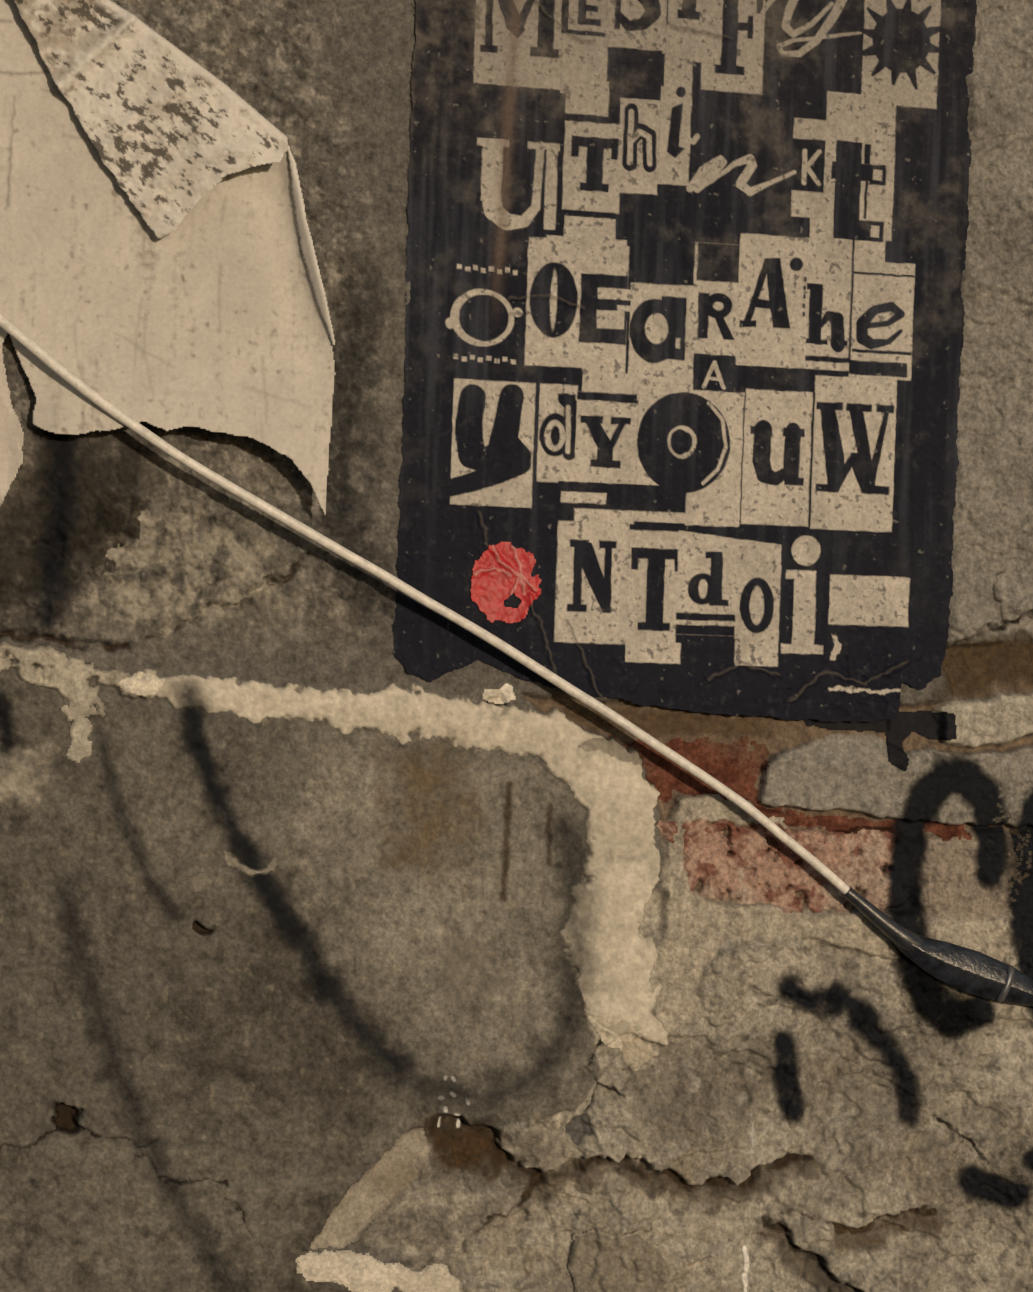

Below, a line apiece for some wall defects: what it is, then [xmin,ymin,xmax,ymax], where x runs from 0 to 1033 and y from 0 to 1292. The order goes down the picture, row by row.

peeling [500,684,516,704]
spalling [607,735,895,913]
spalling [924,821,972,841]
crack [0,1126,157,1157]
crack [936,1117,982,1158]
crack [427,1114,544,1232]
crack [576,1154,813,1191]
crack [170,1179,252,1235]
spalling [295,1128,464,1292]
crack [762,1205,937,1292]